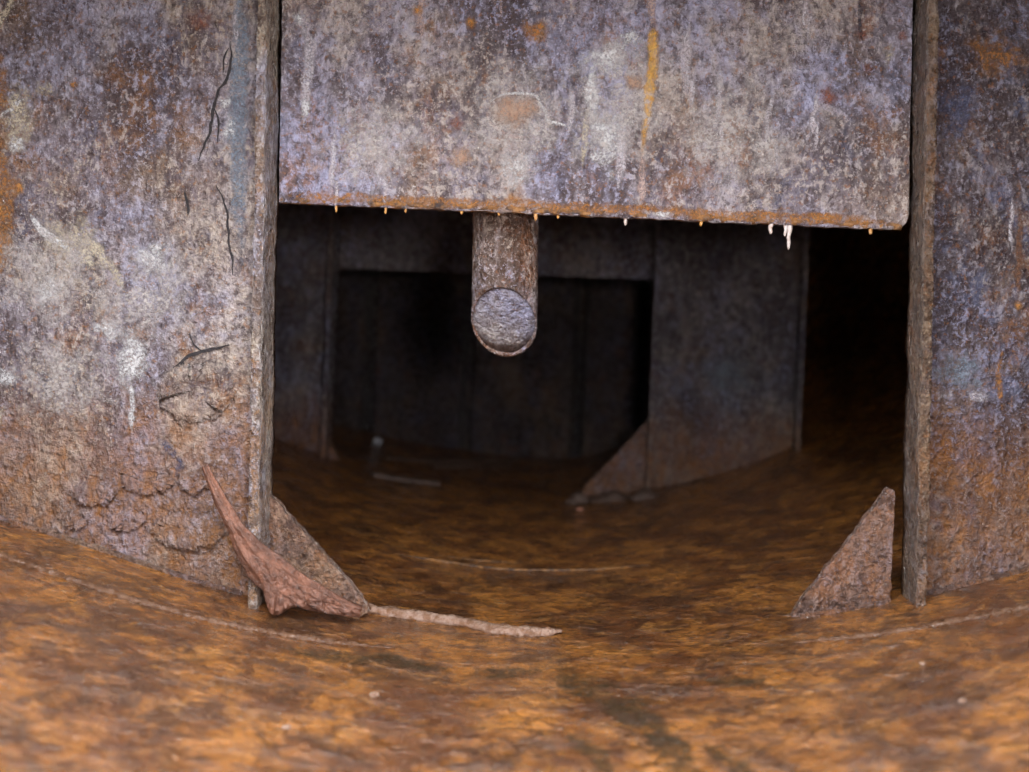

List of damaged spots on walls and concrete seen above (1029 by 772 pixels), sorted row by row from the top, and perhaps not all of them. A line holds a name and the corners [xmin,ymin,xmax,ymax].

crack [198,41,232,161]
rust [642,0,658,137]
rust [0,61,23,271]
crack [183,191,191,215]
crack [216,185,234,275]
crack [173,332,229,368]